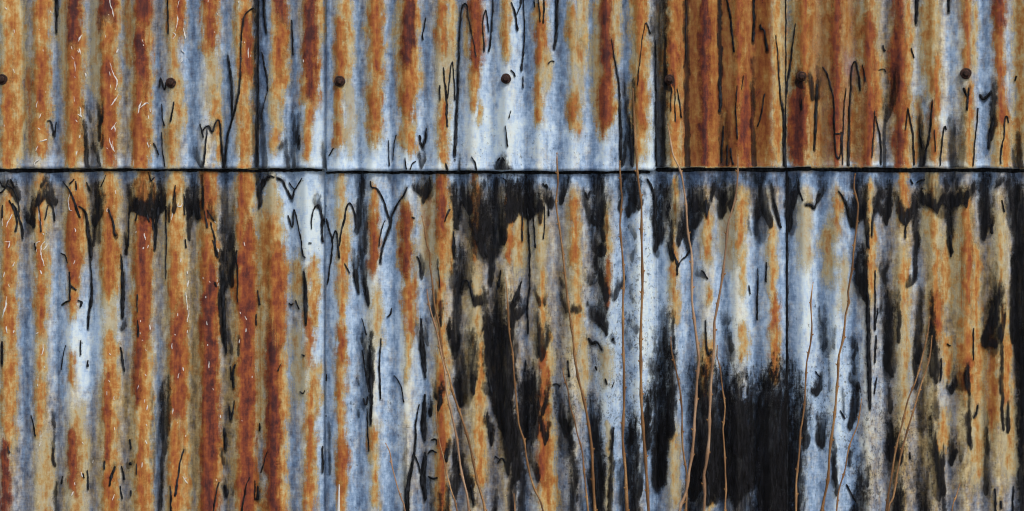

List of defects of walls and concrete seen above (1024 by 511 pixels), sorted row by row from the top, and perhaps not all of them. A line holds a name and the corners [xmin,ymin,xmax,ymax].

rust [499,0,513,64]
rust [531,0,553,127]
damp [38,202,56,232]
rust [0,0,489,511]
damp [322,202,357,258]
damp [378,187,408,263]
damp [521,205,550,334]
damp [647,179,657,236]
rust [564,0,1024,492]
rust [505,209,561,511]
damp [865,288,878,409]
rust [605,420,614,511]